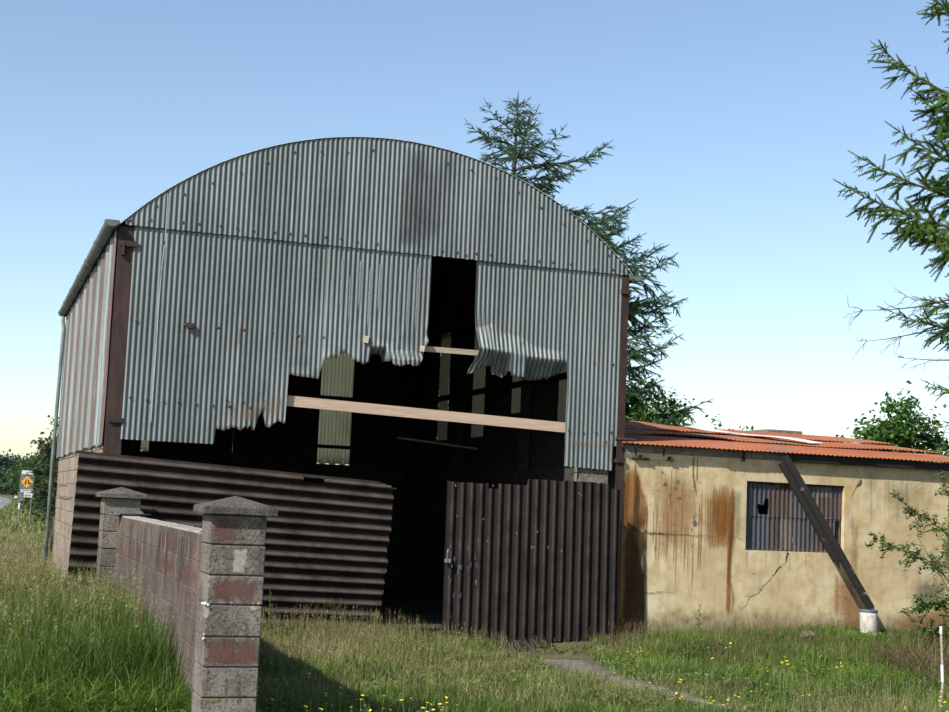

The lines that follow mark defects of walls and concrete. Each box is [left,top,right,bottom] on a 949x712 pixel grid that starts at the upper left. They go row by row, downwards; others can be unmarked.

corrosion [618,448,648,636]
corrosion [707,487,735,612]
crack [741,552,789,609]